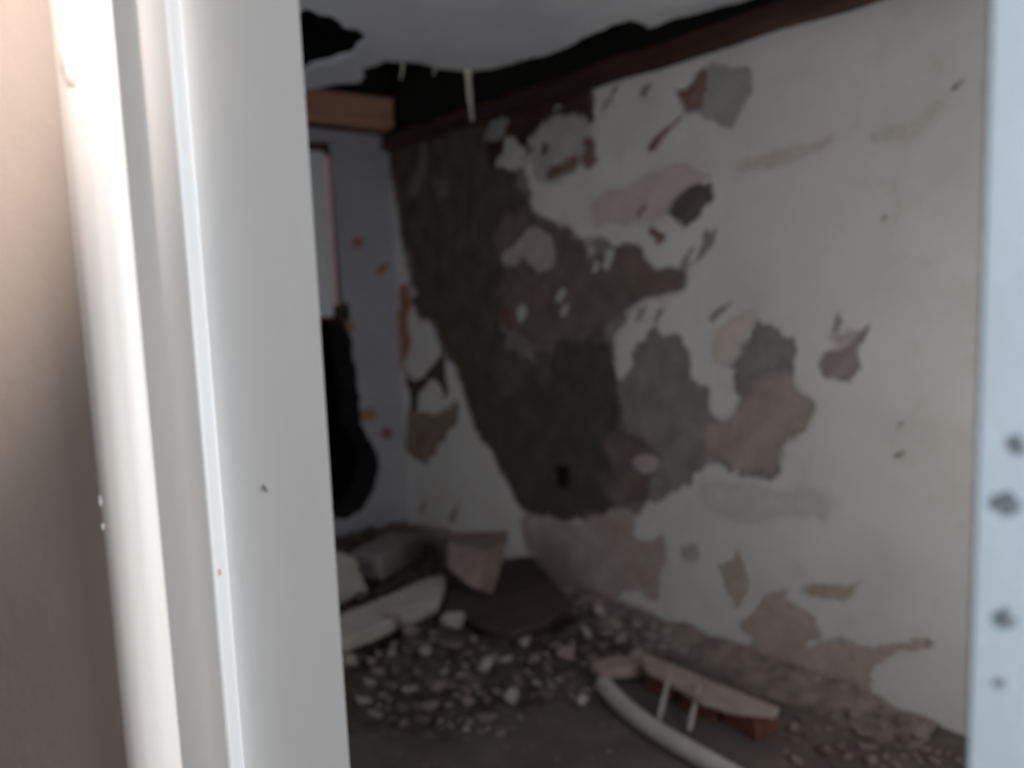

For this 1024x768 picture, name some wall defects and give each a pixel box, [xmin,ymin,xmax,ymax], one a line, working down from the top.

peeling [676,61,755,129]
peeling [389,90,818,524]
peeling [818,311,871,384]